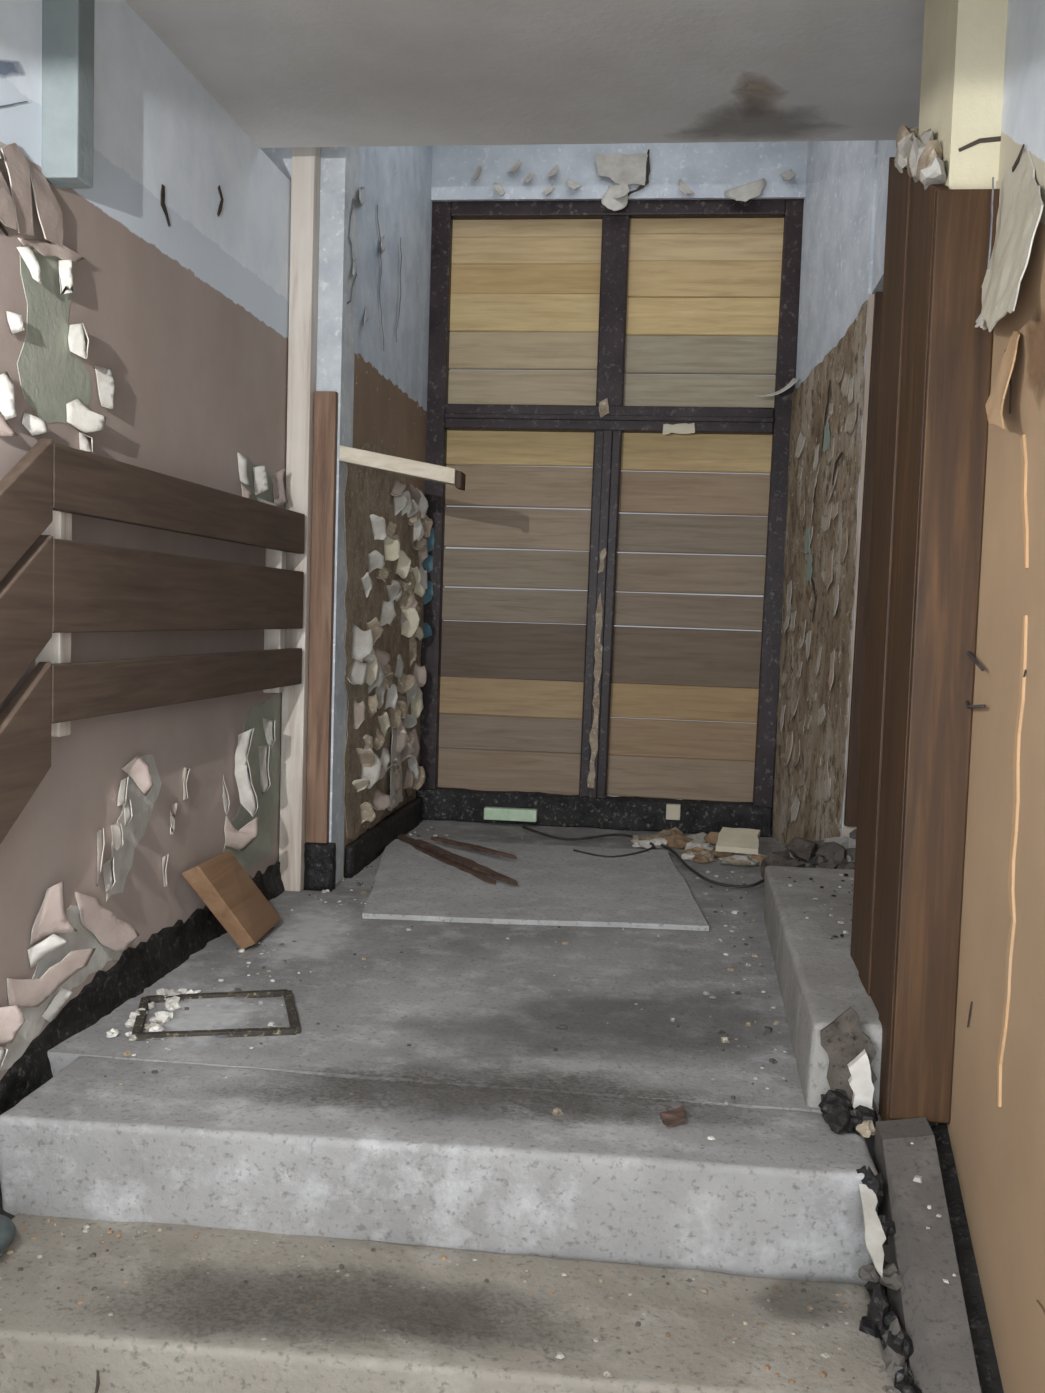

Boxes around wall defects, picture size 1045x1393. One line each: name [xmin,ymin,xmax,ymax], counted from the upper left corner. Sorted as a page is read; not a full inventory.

peeling [0,141,116,452]
peeling [594,149,650,211]
peeling [724,169,796,202]
spalling [894,125,946,190]
peeling [975,151,1044,332]
peeling [986,316,1045,429]
peeling [344,443,434,840]
peeling [753,300,868,846]
peeling [222,694,281,870]
peeling [0,755,190,1071]
spalling [818,1006,878,1138]